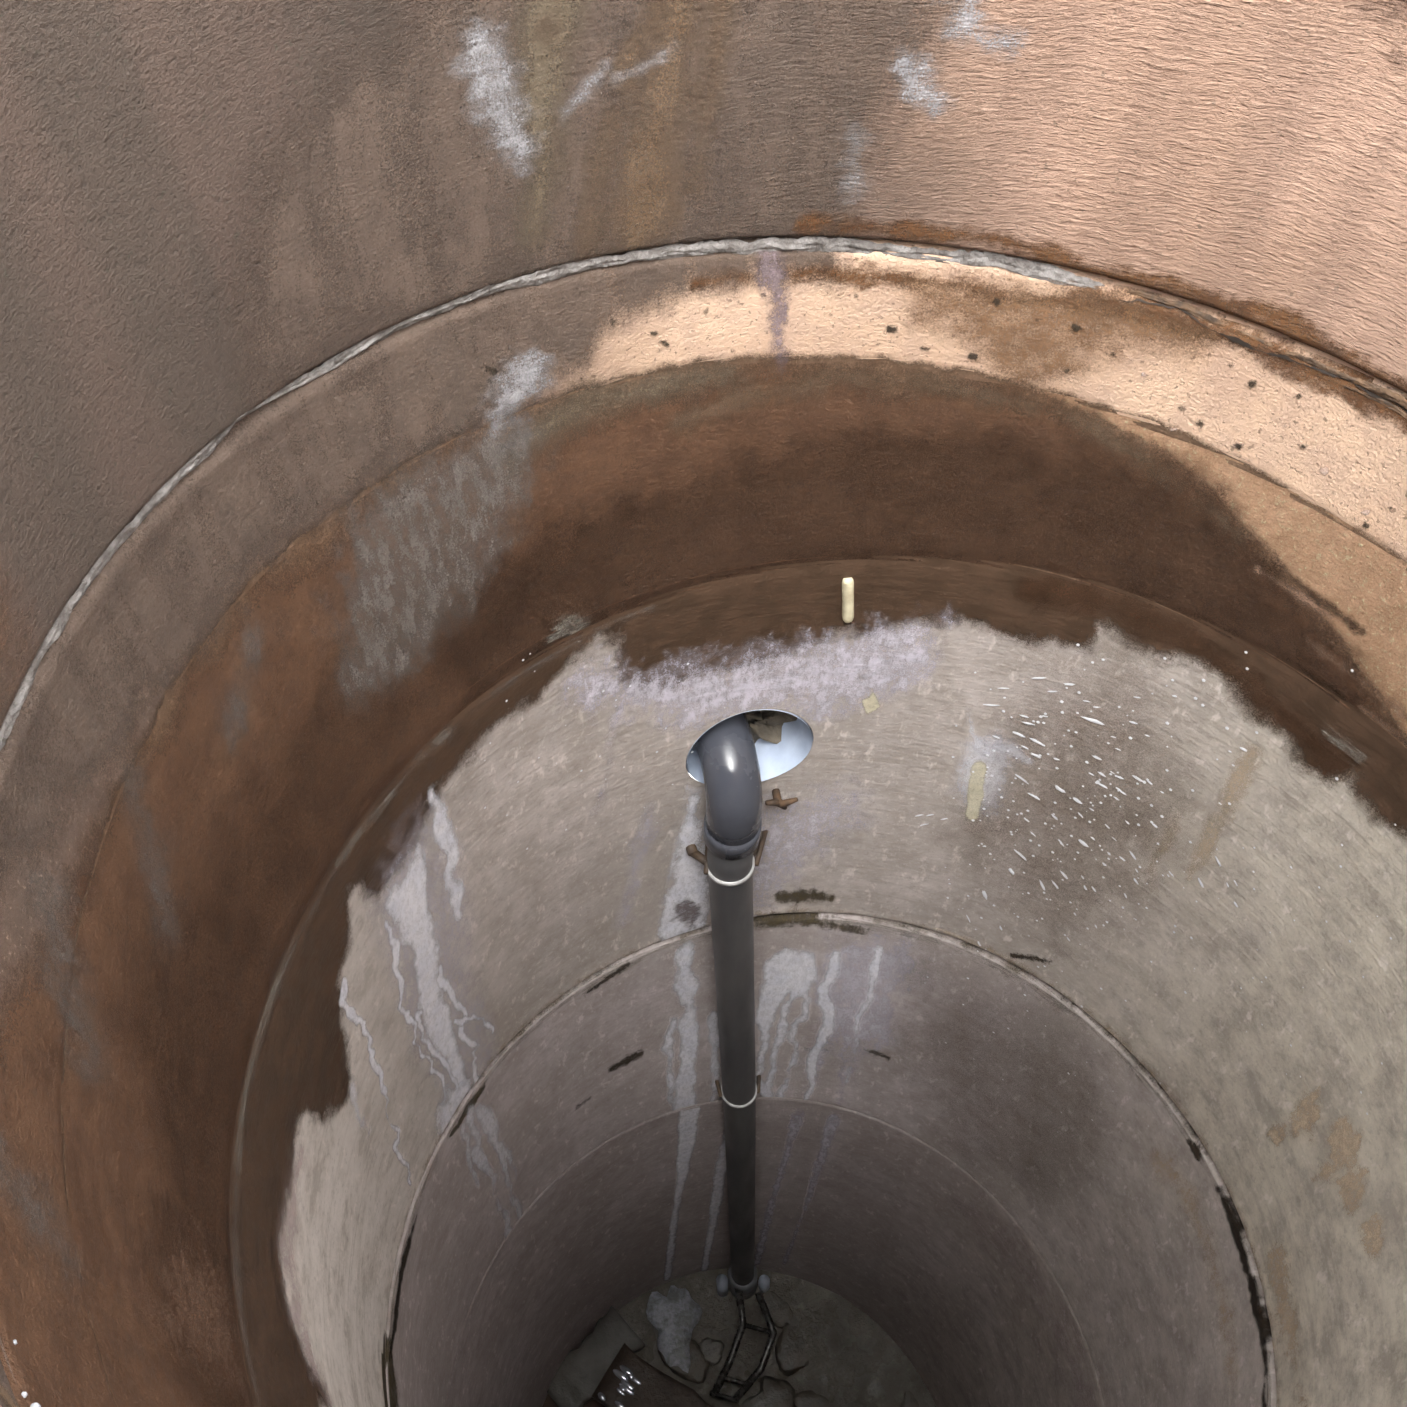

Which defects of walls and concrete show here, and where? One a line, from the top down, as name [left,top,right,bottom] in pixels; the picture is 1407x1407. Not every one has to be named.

water stain [236,0,983,408]
water stain [564,668,619,710]
water stain [960,707,1153,905]
water stain [384,846,494,1134]
water stain [461,1105,522,1237]
water stain [658,795,720,1281]
water stain [701,1135,726,1271]
water stain [753,794,914,1265]